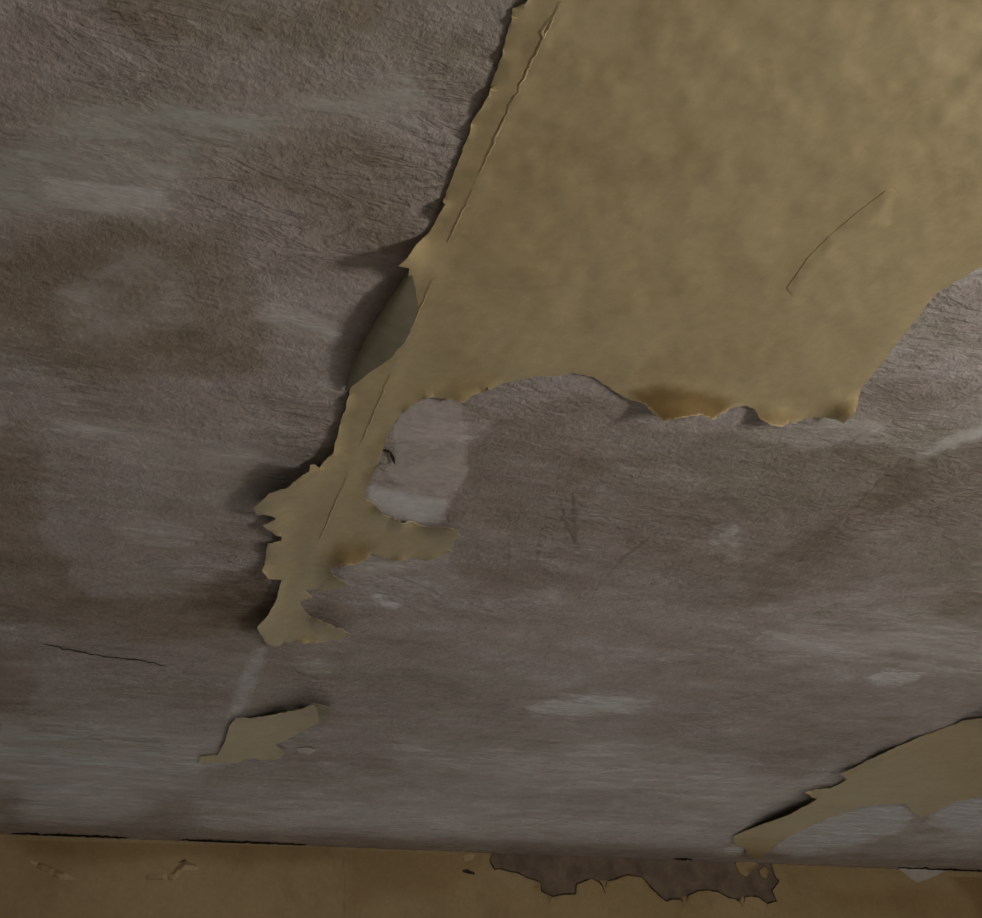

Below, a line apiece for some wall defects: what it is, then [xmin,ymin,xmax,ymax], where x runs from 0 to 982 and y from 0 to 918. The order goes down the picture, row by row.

peeling [253,0,982,646]
crack [45,644,166,667]
peeling [197,703,332,764]
peeling [490,718,982,907]